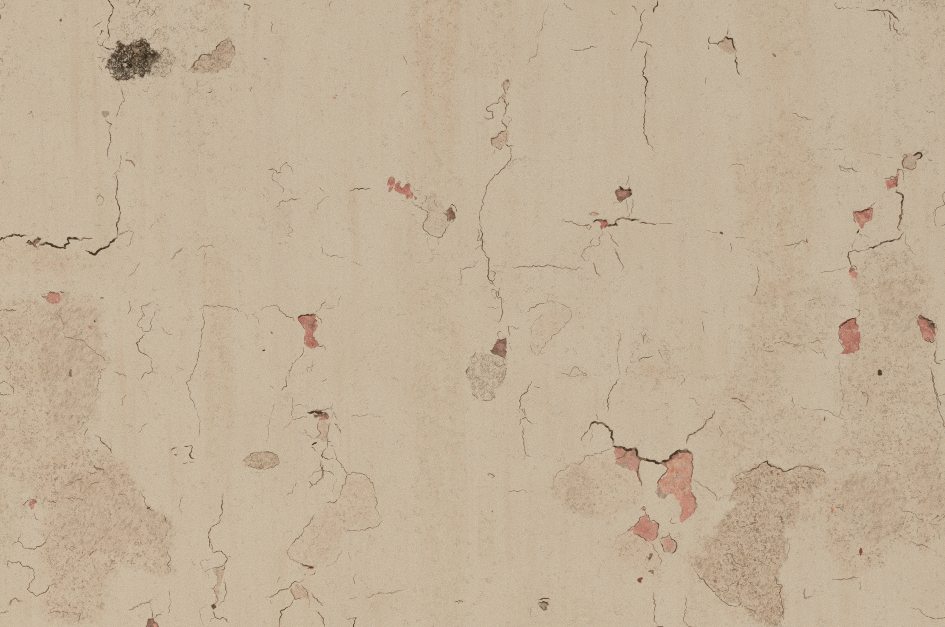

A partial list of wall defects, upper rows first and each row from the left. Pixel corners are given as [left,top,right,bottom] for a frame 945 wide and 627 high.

leakage [98,0,255,92]
peeling [187,35,238,77]
crack [611,0,658,148]
crack [0,89,135,256]
peeling [384,174,458,244]
crack [460,148,671,348]
spalling [295,311,326,352]
spalling [487,335,510,360]
spalling [811,314,864,358]
spalling [914,313,939,344]
crack [686,411,723,444]
spalling [580,444,700,577]